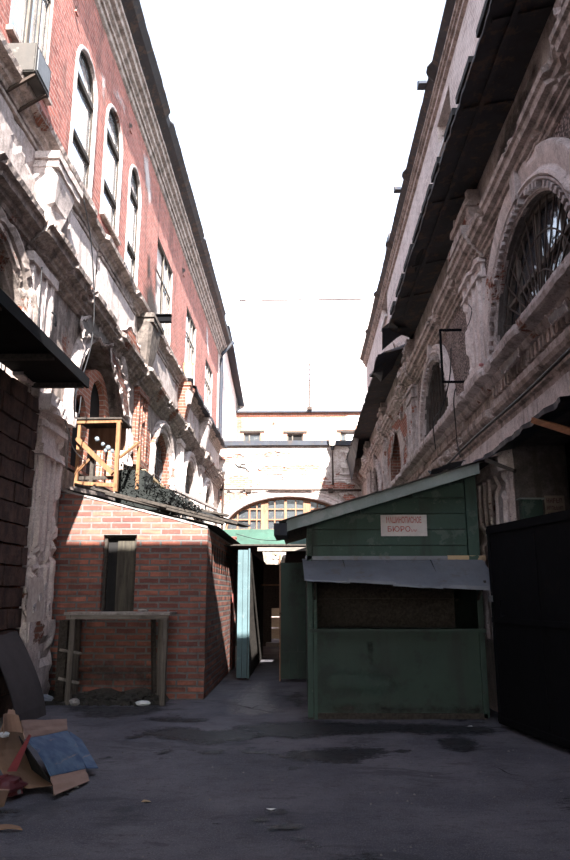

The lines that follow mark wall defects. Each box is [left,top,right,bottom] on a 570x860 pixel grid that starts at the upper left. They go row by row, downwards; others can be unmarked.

spalling [219,436,303,463]
spalling [218,473,255,507]
spalling [321,481,359,501]
leakage [69,703,503,770]